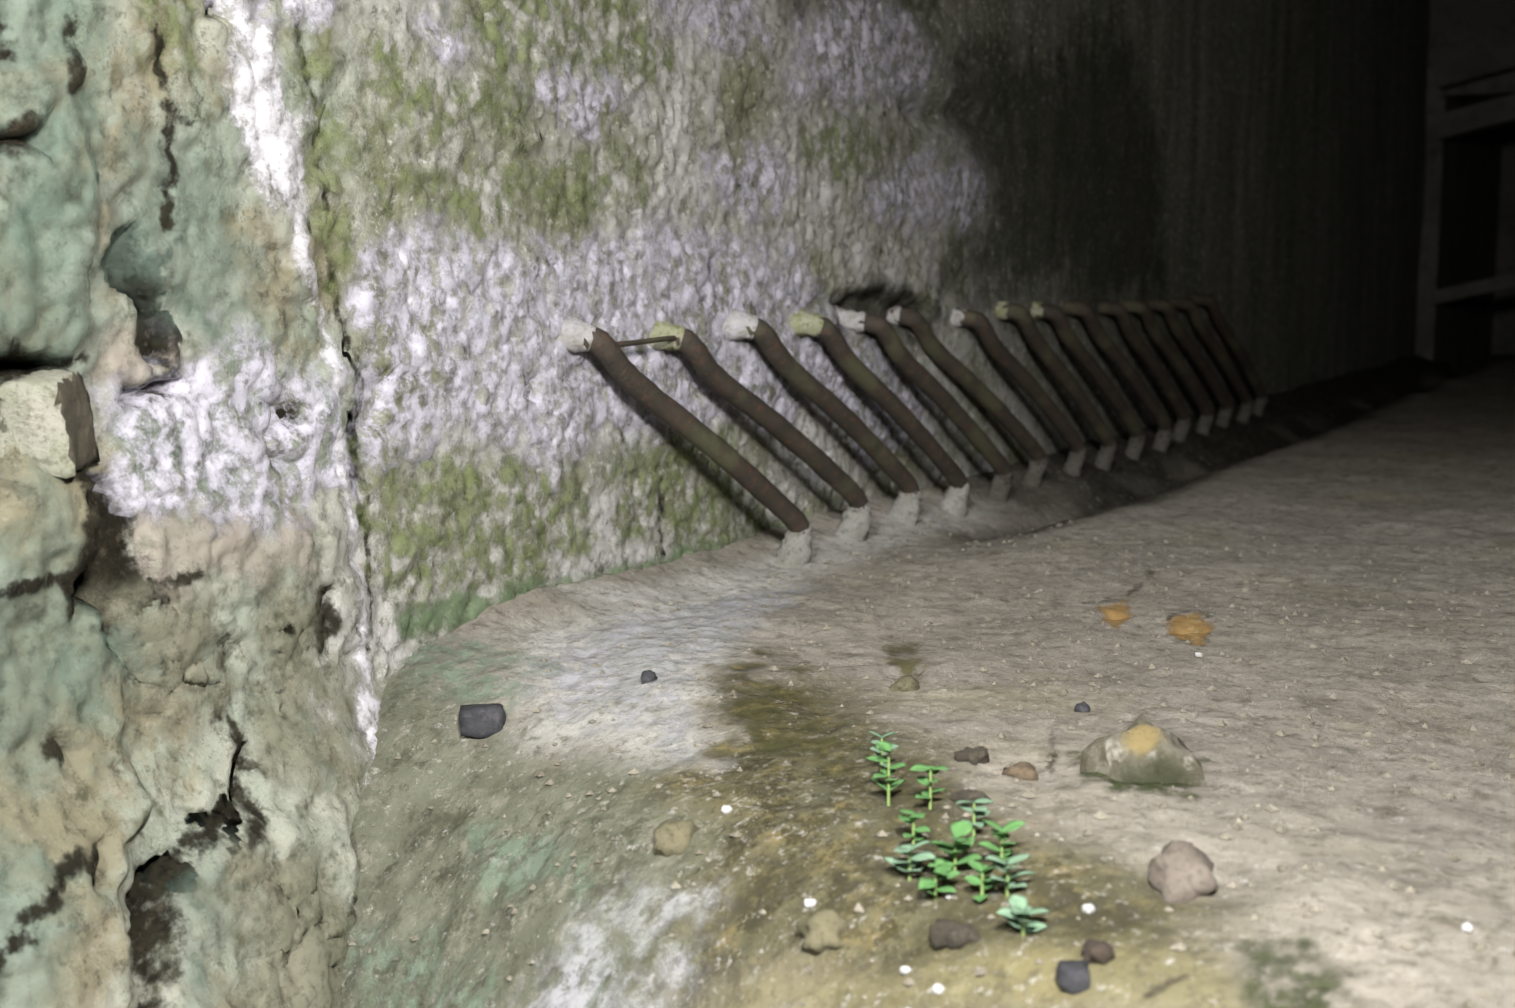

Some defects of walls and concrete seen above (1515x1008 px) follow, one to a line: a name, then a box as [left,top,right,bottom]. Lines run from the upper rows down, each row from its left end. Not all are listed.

crack [125,568,203,601]
crack [127,632,281,899]